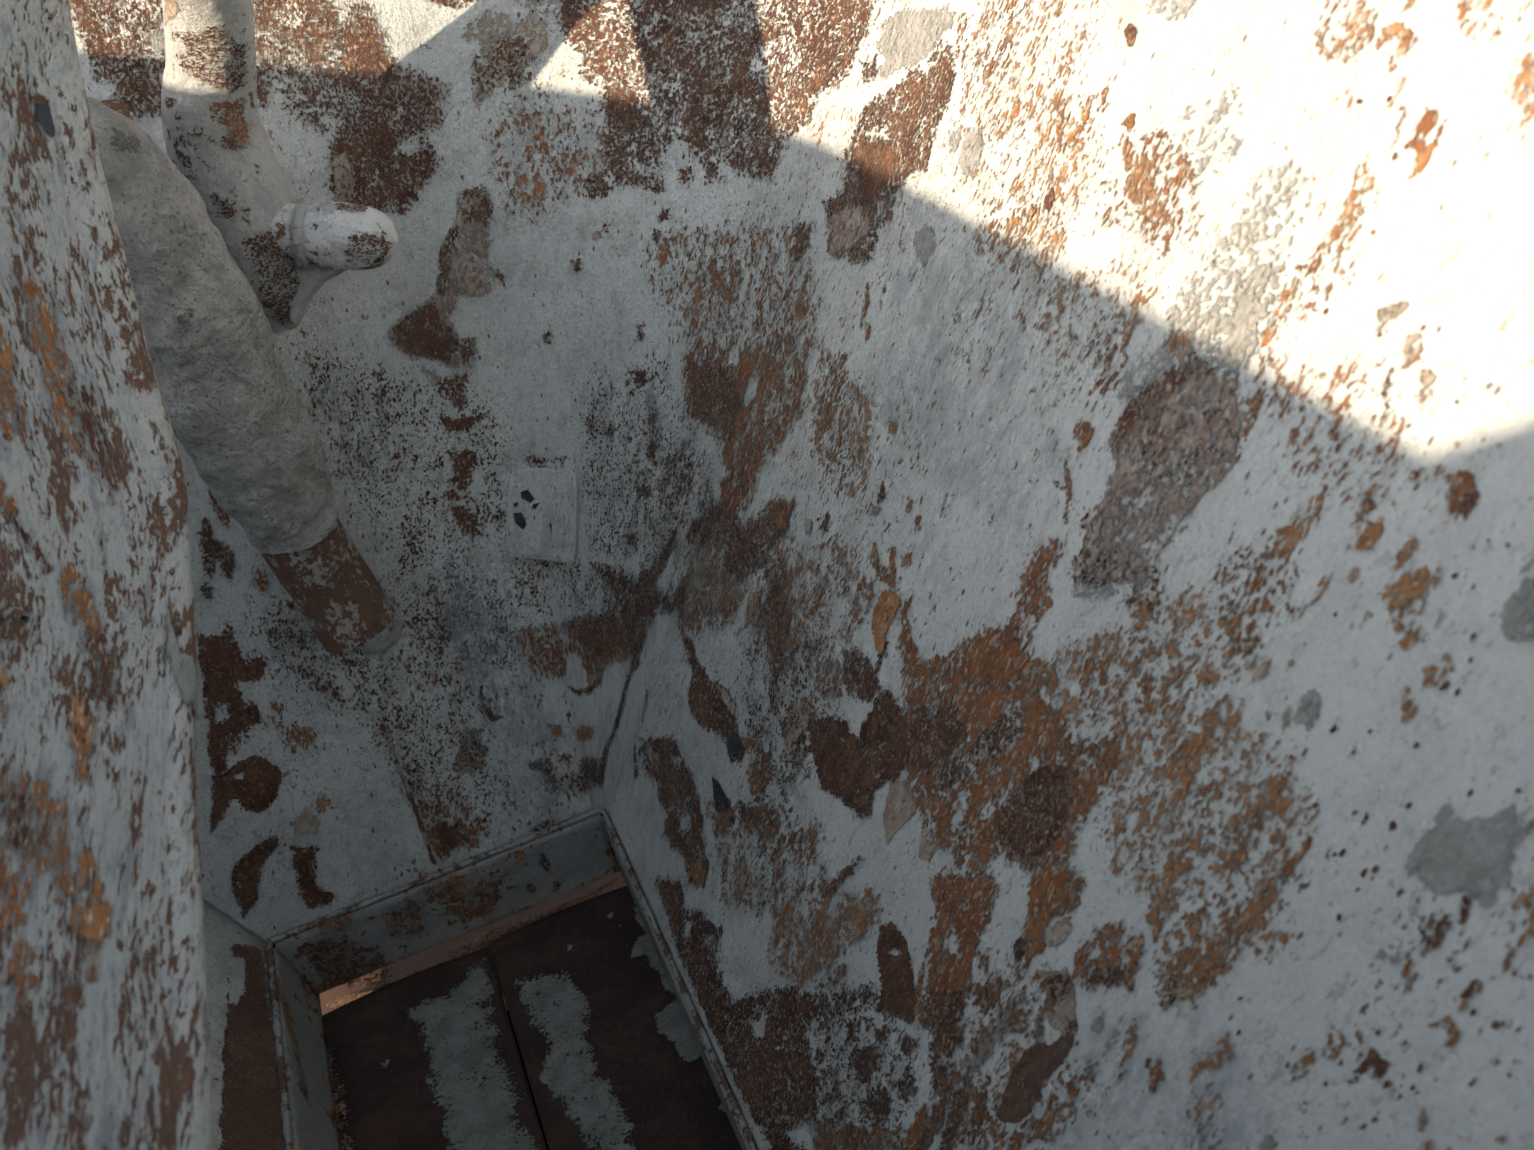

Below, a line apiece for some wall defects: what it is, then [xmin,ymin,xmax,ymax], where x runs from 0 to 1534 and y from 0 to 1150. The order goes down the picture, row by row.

spalling [872,3,955,89]
rust [481,0,879,230]
rust [1395,105,1447,183]
rust [820,0,1204,399]
spalling [912,224,935,263]
peeling [1069,153,1330,595]
rust [196,153,1481,1150]
spalling [1252,659,1294,683]
spalling [1281,689,1337,733]
peeling [712,777,735,827]
peeling [883,779,917,844]
peeling [996,965,1127,1124]